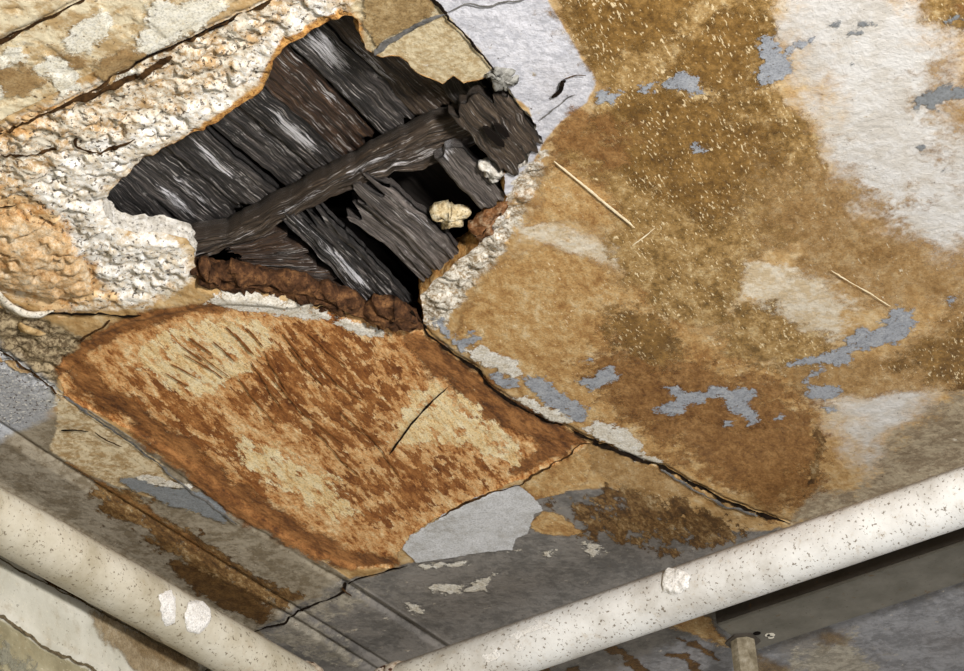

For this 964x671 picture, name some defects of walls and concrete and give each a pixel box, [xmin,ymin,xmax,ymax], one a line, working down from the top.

peeling [0,8,115,97]
crack [0,0,272,158]
peeling [102,0,484,266]
crack [47,312,141,343]
leakage [455,0,964,559]
rust [54,303,590,571]
crack [410,310,790,524]
peeling [651,385,785,428]
peeling [402,485,543,570]
crack [0,558,212,671]
leakage [604,645,650,671]
leakage [664,615,728,671]